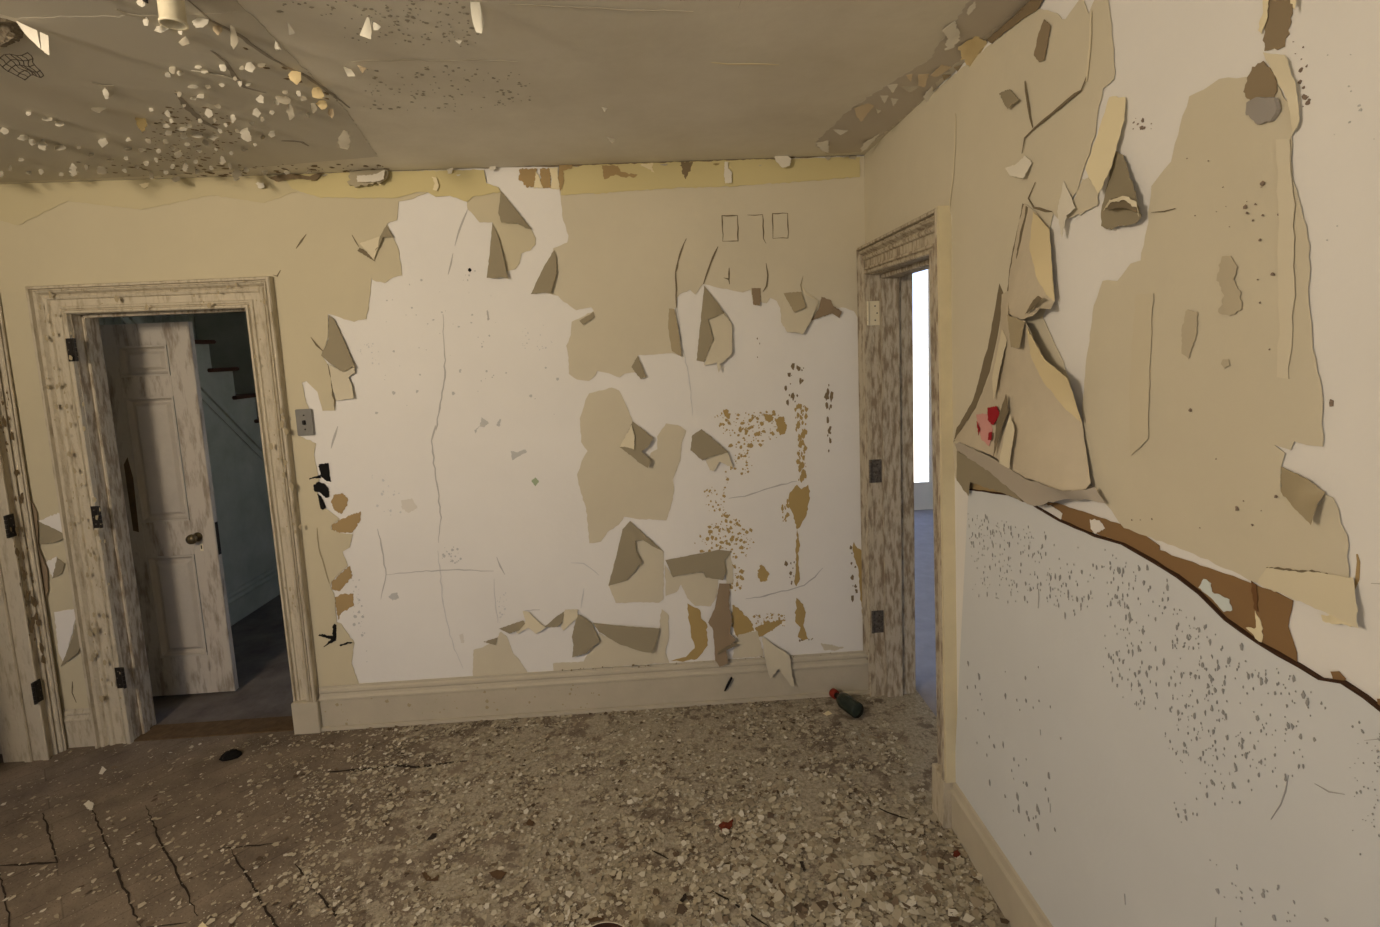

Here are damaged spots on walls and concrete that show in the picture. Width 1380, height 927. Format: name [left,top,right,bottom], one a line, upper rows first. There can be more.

flaking render [0,18,49,55]
peeling [0,62,350,188]
peeling [137,0,239,50]
spalling [1243,0,1300,132]
flaking render [309,463,361,533]
crack [377,317,531,668]
flaking render [318,566,354,647]
flaking render [731,485,810,641]
water stain [968,514,1326,823]
spalling [969,482,1380,712]
mould [976,735,1056,855]
mould [1349,721,1380,837]